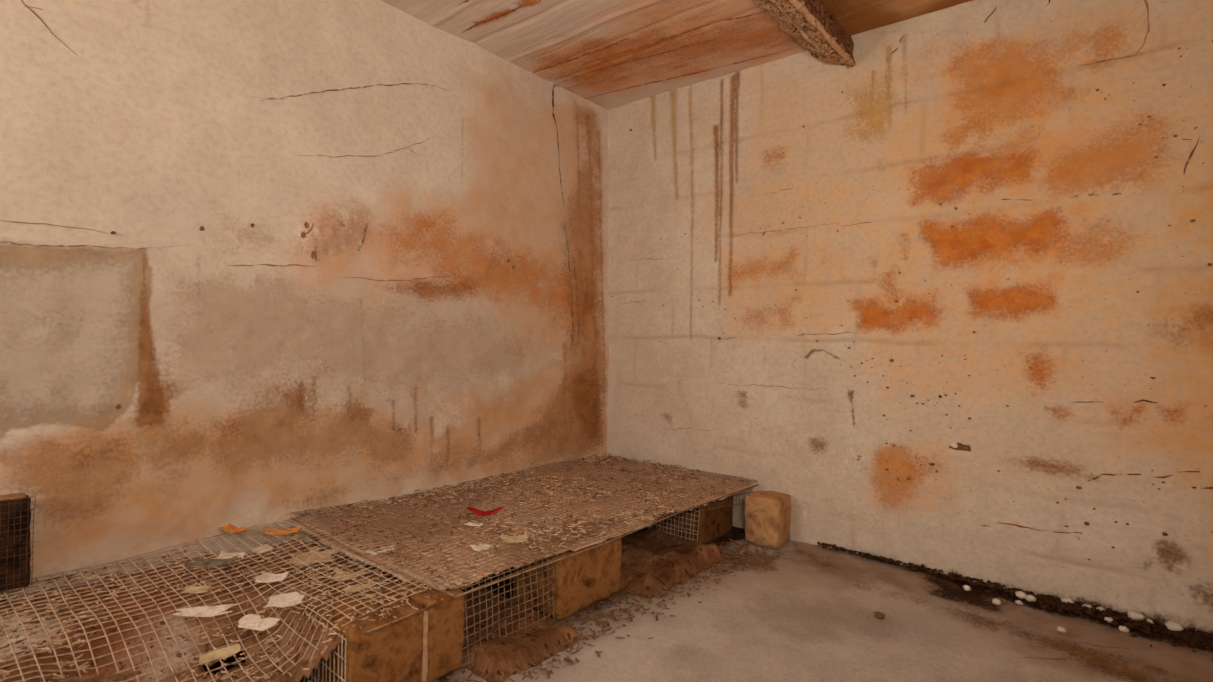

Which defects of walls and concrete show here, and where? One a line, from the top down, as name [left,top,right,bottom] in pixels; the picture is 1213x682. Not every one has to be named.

crack [21,0,77,55]
spalling [754,0,856,69]
crack [1078,0,1150,66]
crack [251,83,445,101]
corrosion [912,123,1033,205]
corrosion [922,211,1063,265]
flaking render [0,231,151,437]
leakage [396,110,604,472]
corrosion [970,286,1055,318]
leakage [11,379,467,516]
leakage [1157,541,1184,569]
leakage [861,553,1213,682]